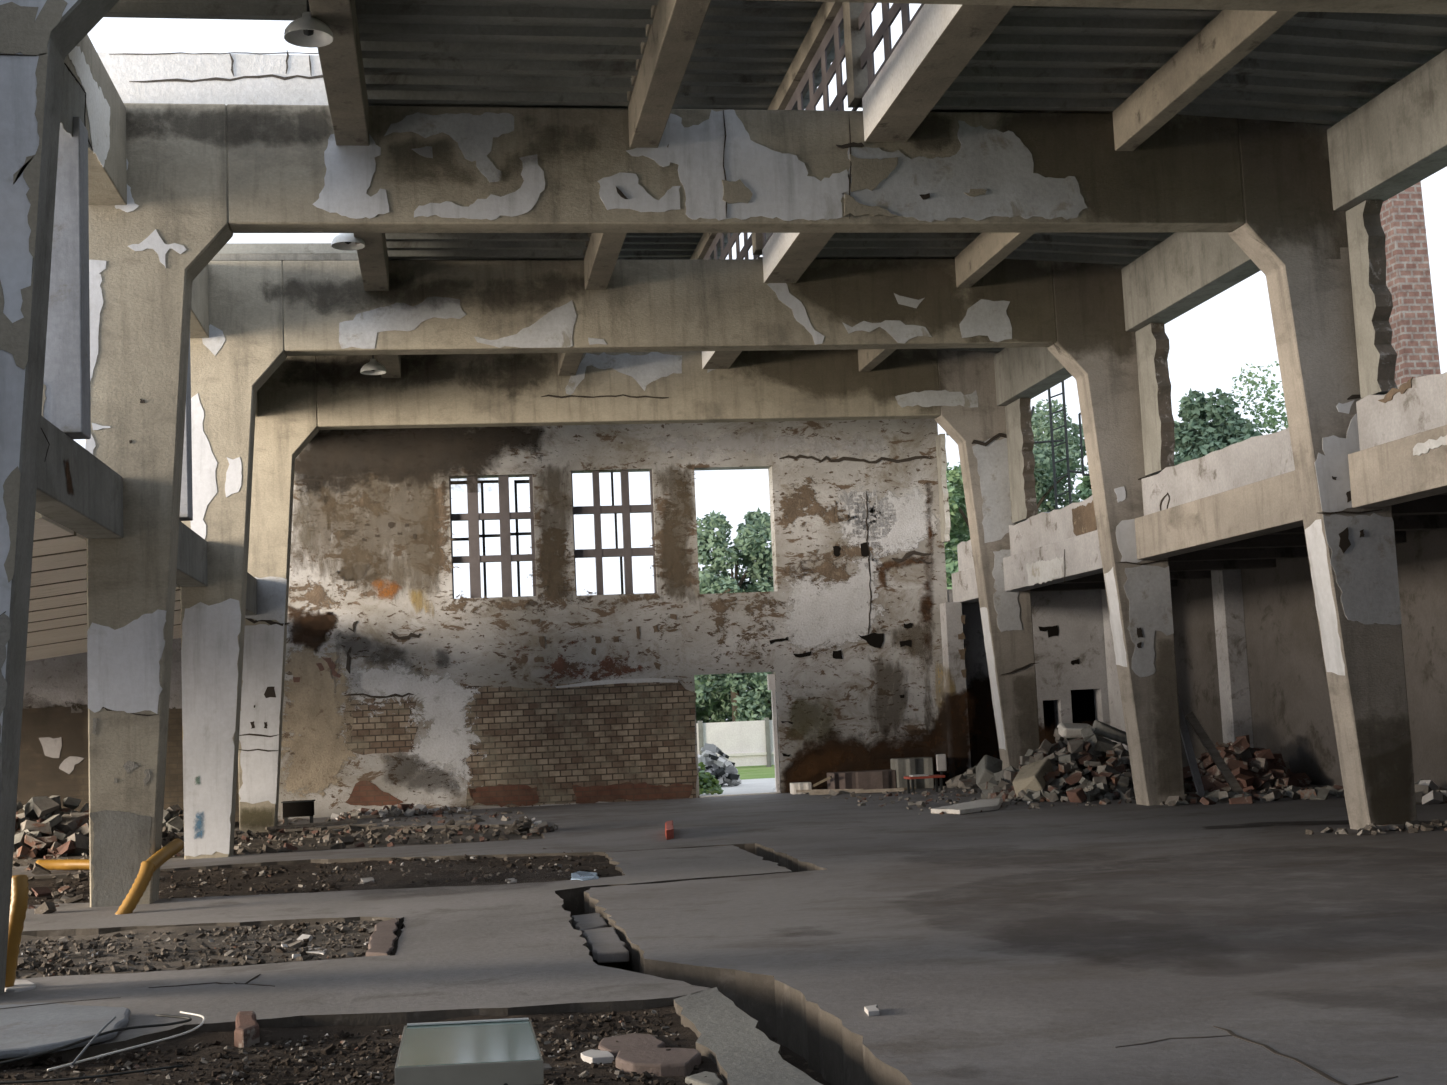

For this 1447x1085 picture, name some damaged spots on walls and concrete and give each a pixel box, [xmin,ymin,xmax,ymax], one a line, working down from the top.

peeling [627,116,670,167]
peeling [0,0,93,370]
peeling [722,179,753,204]
peeling [836,142,898,216]
peeling [894,293,924,308]
peeling [1336,400,1354,414]
spalling [1378,377,1413,403]
peeling [3,466,21,583]
peeling [1339,527,1365,553]
flaking render [435,464,885,807]
peeling [250,636,418,806]
crack [1115,1026,1398,1085]